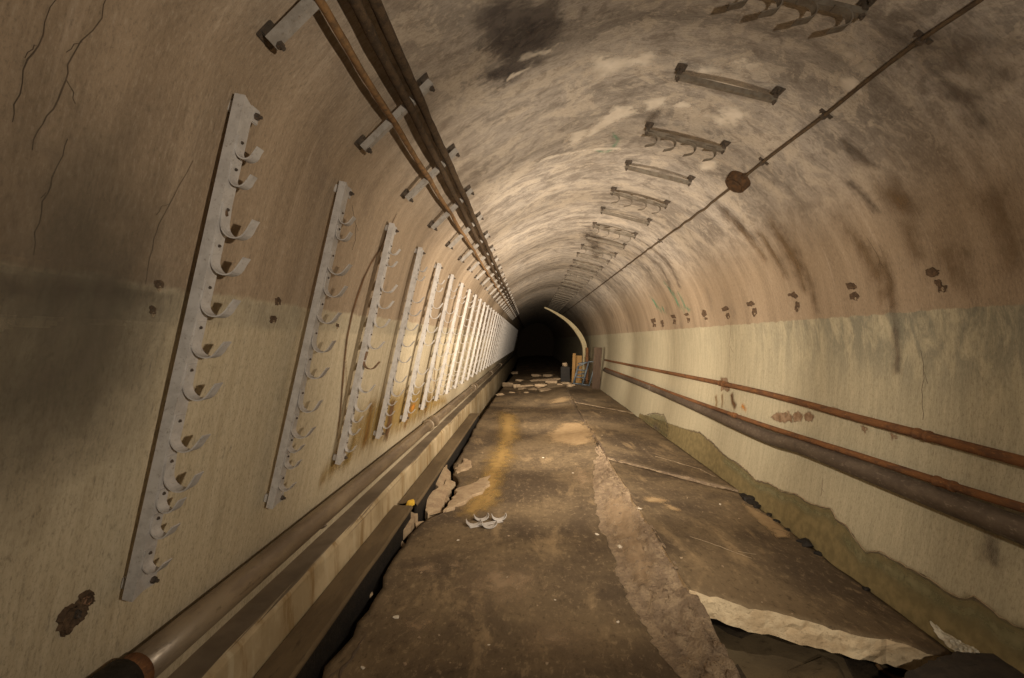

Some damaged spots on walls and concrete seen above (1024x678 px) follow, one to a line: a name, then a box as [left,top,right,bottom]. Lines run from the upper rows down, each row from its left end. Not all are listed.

crack [12,0,56,122]
crack [32,0,106,150]
water stain [477,0,559,82]
crack [33,139,68,255]
crack [145,161,193,284]
water stain [760,227,805,289]
spalling [772,411,814,423]
peeling [639,413,1024,678]